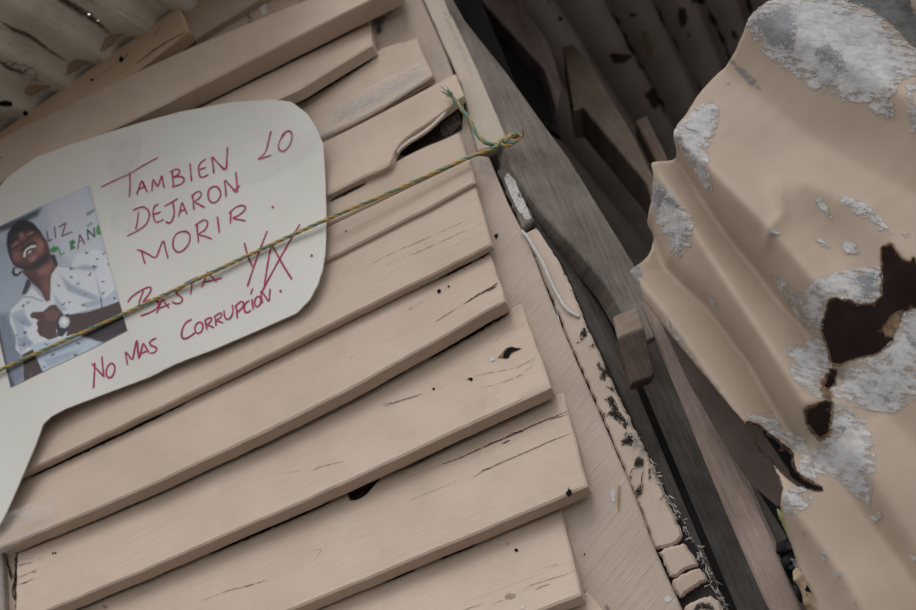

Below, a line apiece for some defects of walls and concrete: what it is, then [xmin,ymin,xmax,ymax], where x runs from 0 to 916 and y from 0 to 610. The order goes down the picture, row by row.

peeling [746,0,916,132]
peeling [674,101,719,191]
peeling [651,180,696,259]
peeling [839,196,908,237]
peeling [747,266,916,522]
crack [443,411,571,477]